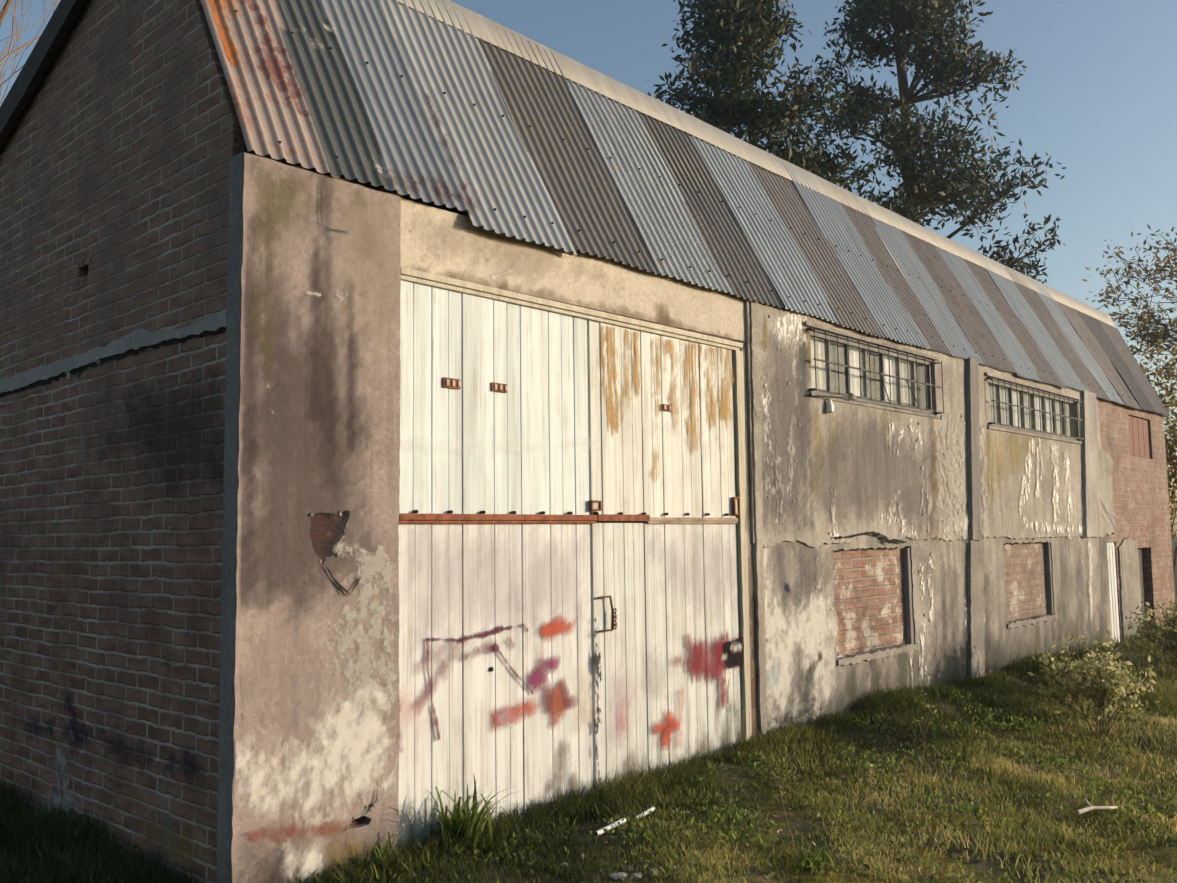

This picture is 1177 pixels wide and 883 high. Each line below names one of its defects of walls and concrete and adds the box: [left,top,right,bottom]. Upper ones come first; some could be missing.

corrosion [209,0,238,66]
corrosion [247,1,309,115]
corrosion [660,312,694,332]
leakage [761,311,814,527]
leakage [828,488,845,541]
crack [834,531,907,544]
leakage [879,418,935,539]
leakage [970,427,989,541]
leakage [1019,438,1093,606]
peeling [236,511,397,823]
peeling [283,839,322,883]